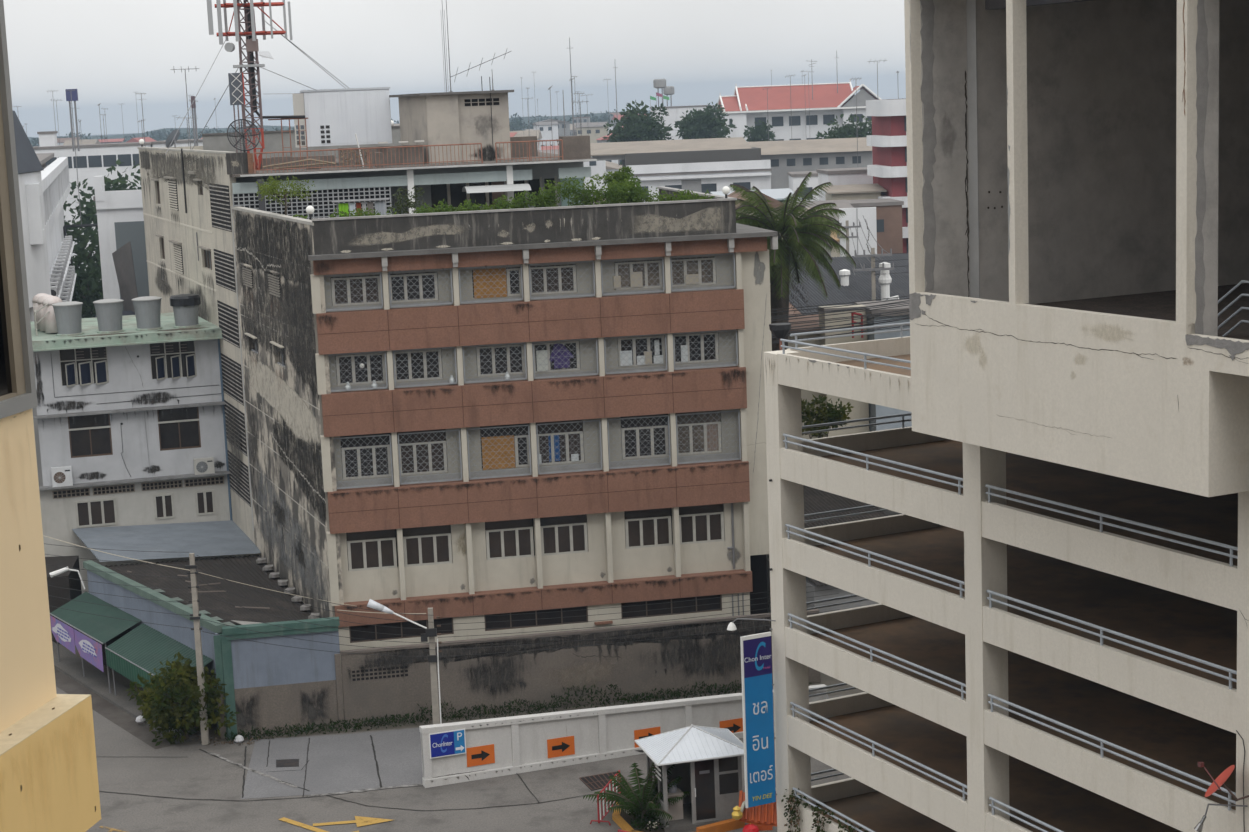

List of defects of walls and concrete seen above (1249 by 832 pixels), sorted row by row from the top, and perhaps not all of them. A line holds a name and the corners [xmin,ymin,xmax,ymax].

crack [963,71,971,291]
damp [235,213,332,399]
crack [915,314,1249,364]
damp [349,617,772,695]